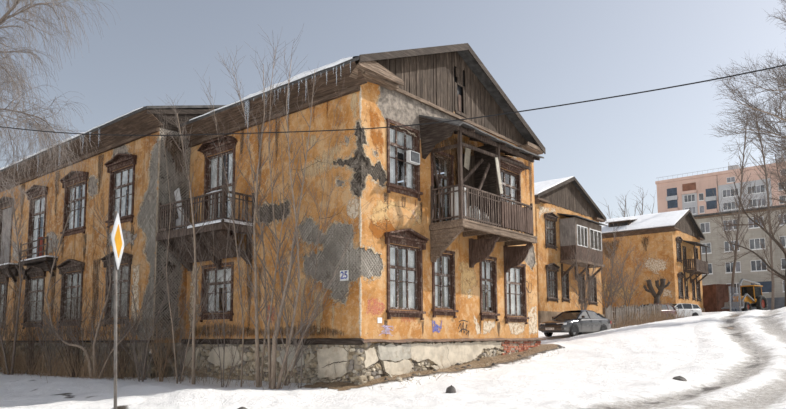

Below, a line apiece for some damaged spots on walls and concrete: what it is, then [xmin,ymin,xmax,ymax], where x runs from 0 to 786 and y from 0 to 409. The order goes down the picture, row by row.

spalling [112,144,130,158]
spalling [122,127,199,340]
spalling [256,198,291,226]
spalling [298,86,387,337]